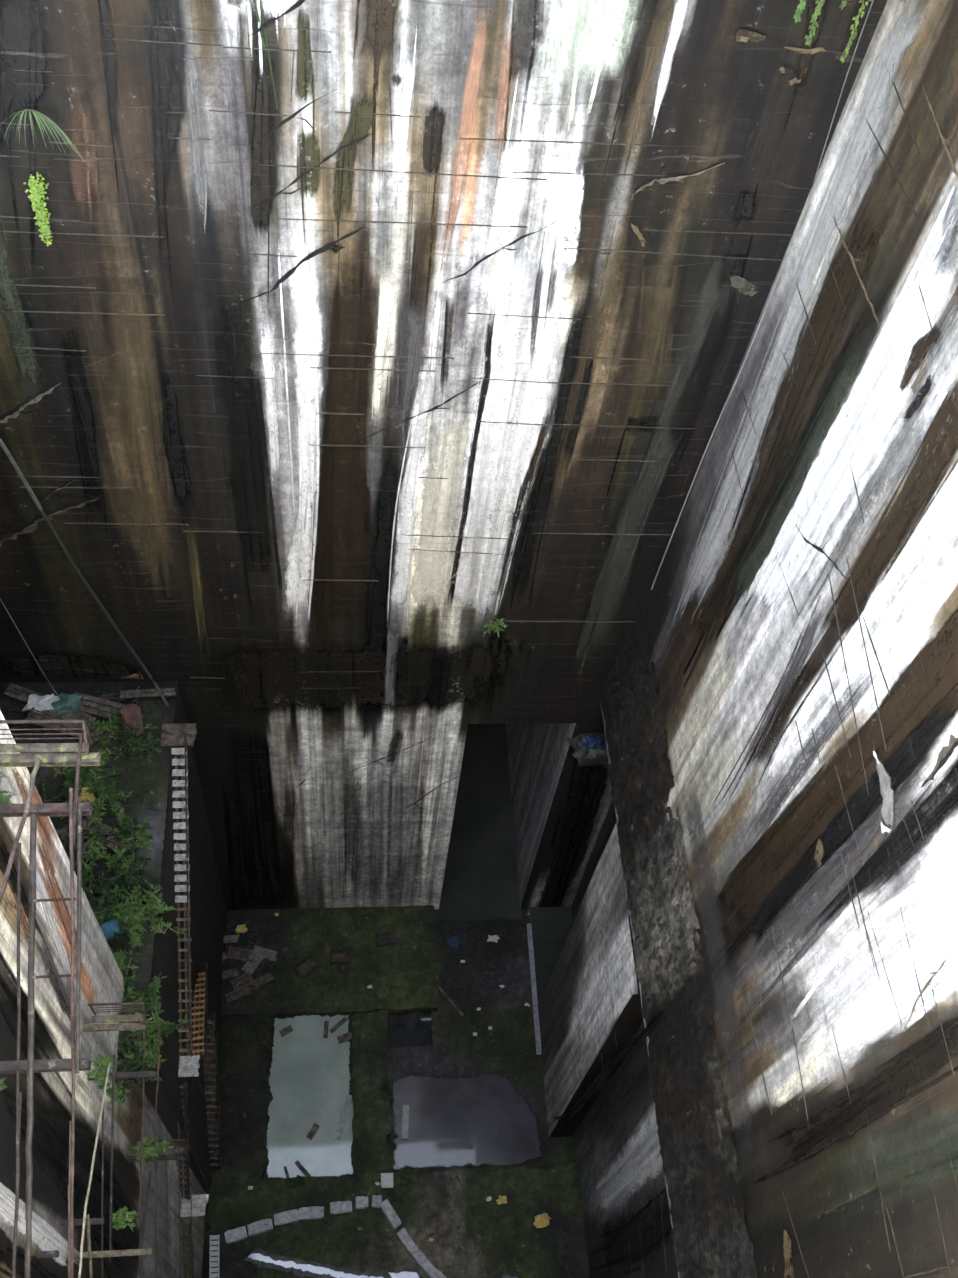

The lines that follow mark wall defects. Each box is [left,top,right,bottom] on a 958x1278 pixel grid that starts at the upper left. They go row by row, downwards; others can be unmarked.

leakage [0,14,36,251]
corrosion [441,44,484,268]
crack [238,227,364,305]
crack [442,221,556,283]
leakage [212,0,597,741]
leakage [387,731,403,770]
crack [921,734,958,788]